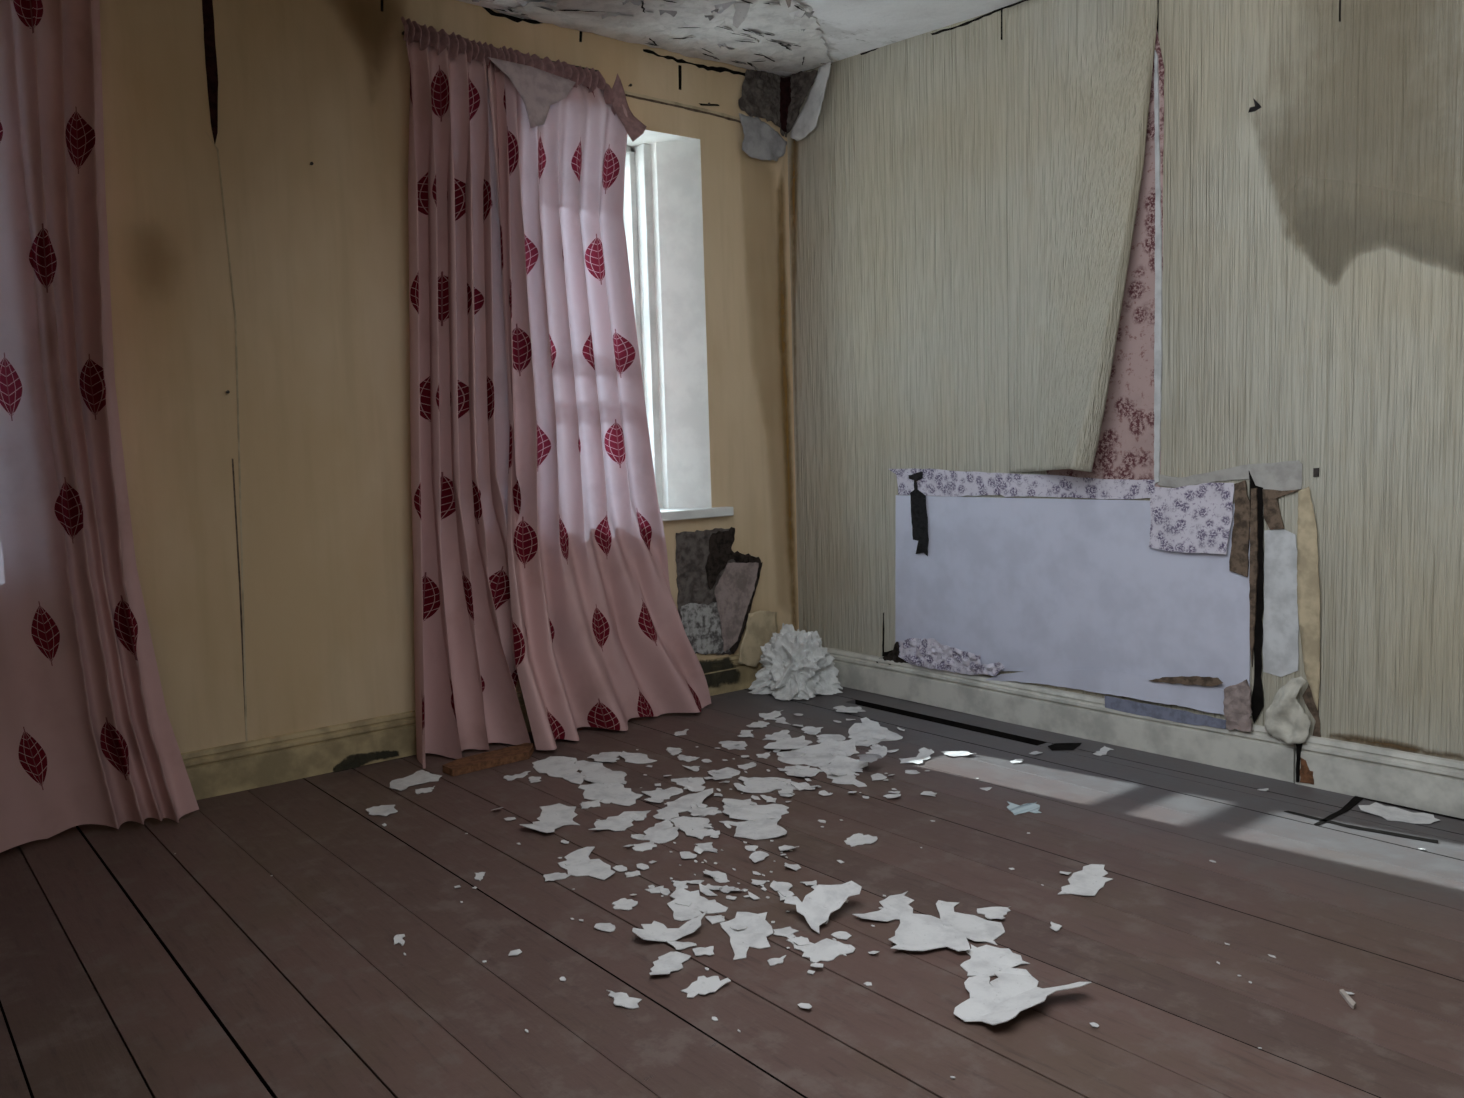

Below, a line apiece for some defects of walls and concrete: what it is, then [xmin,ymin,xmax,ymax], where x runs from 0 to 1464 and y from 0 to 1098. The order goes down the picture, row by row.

crack [202,0,218,144]
crack [483,7,541,24]
peeling [472,0,832,161]
crack [643,49,745,90]
flaking render [676,527,778,668]
flaking render [1262,487,1320,710]
flaking render [1223,679,1253,732]